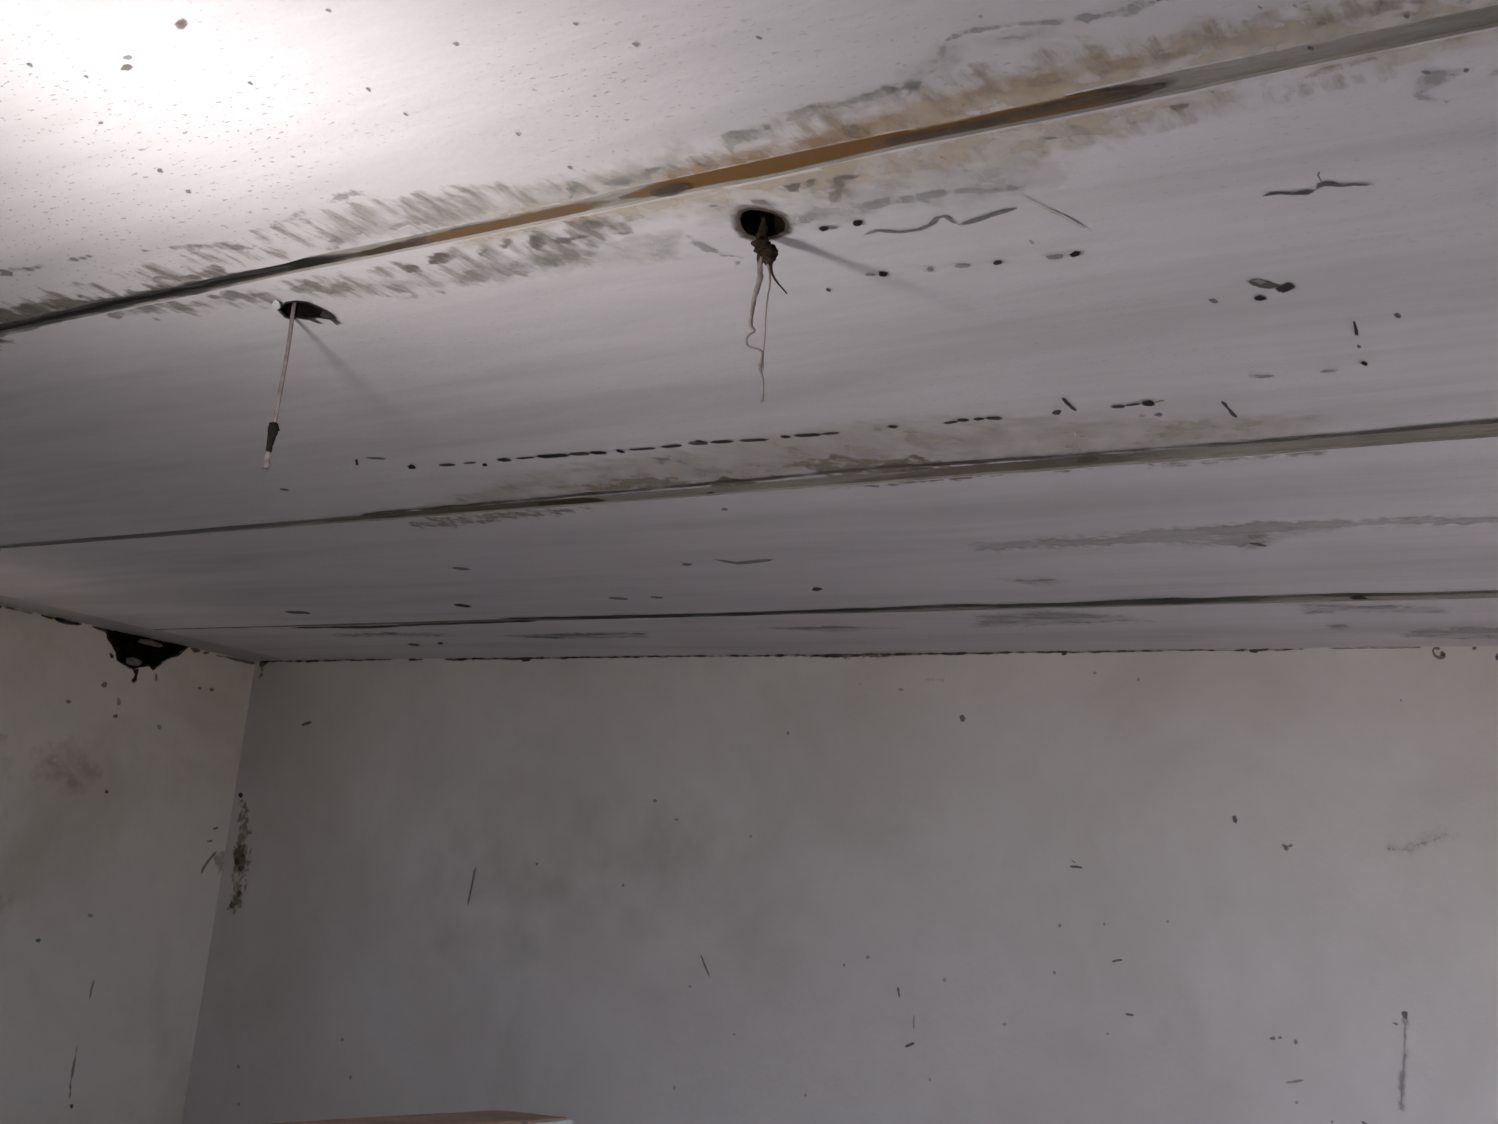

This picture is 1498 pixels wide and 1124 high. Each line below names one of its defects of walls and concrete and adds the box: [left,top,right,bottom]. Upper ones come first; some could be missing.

damp [792,82,926,132]
damp [392,188,484,230]
damp [567,166,660,198]
damp [830,175,857,203]
damp [856,186,1017,210]
crack [1264,172,1369,196]
damp [376,217,627,295]
damp [0,245,274,343]
damp [283,278,360,293]
damp [786,454,1000,487]
hole [105,628,188,683]
damp [201,793,251,914]